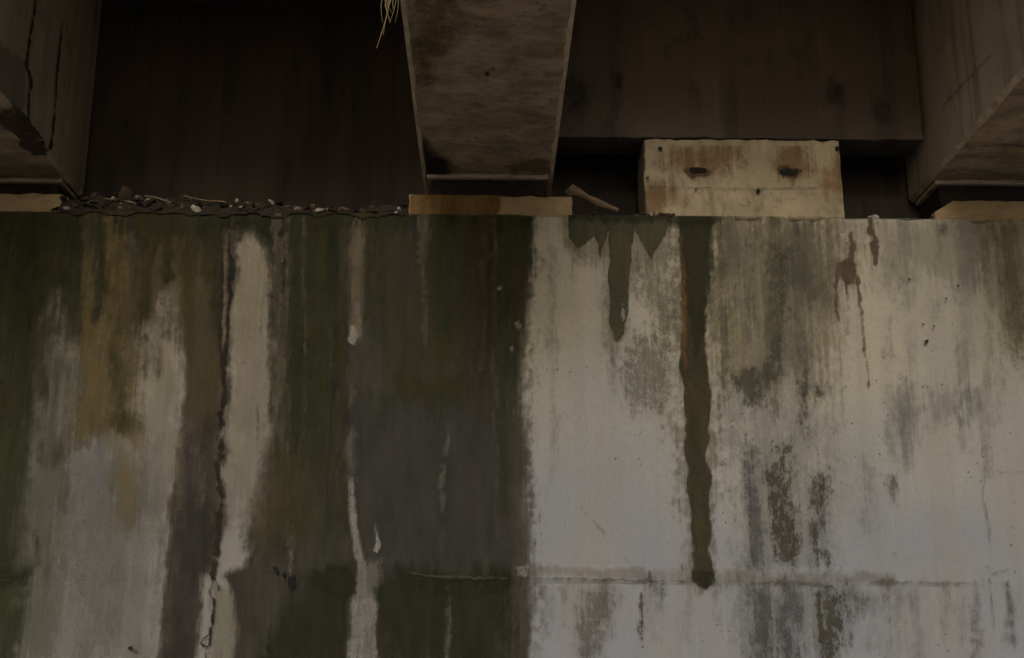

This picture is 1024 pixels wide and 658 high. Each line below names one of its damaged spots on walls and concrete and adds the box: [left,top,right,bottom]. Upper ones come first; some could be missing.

crack [200,212,236,658]
water stain [0,211,542,658]
water stain [568,215,839,589]